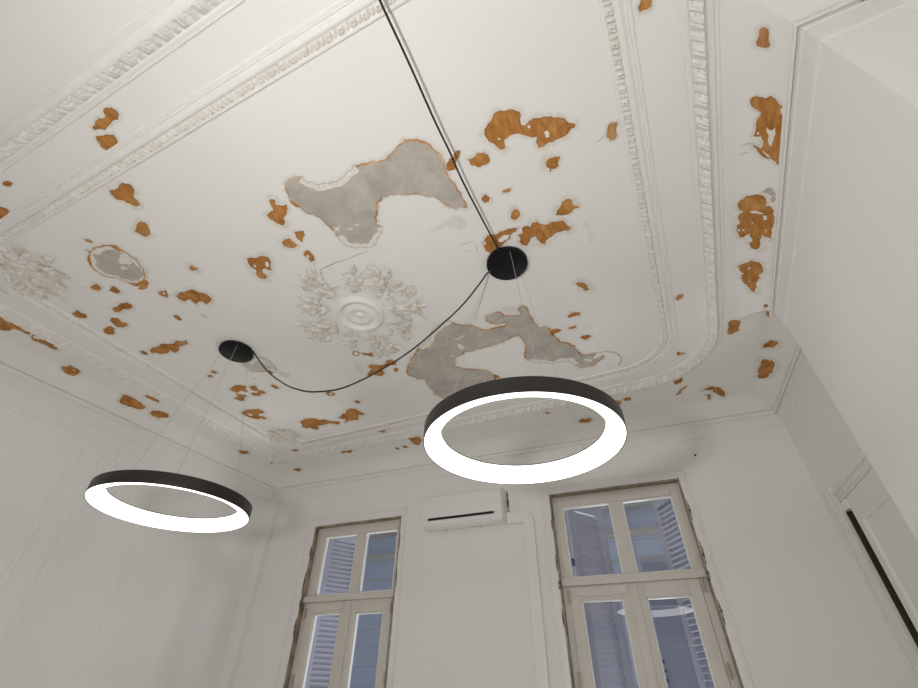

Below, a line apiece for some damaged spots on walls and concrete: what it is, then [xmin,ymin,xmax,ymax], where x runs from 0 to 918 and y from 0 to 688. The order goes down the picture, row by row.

peeling [633,0,658,19]
peeling [746,92,784,168]
spalling [237,103,586,285]
spalling [77,236,218,336]
peeling [730,188,778,319]
peeling [0,317,85,378]
peeling [136,338,194,357]
spalling [352,303,622,401]